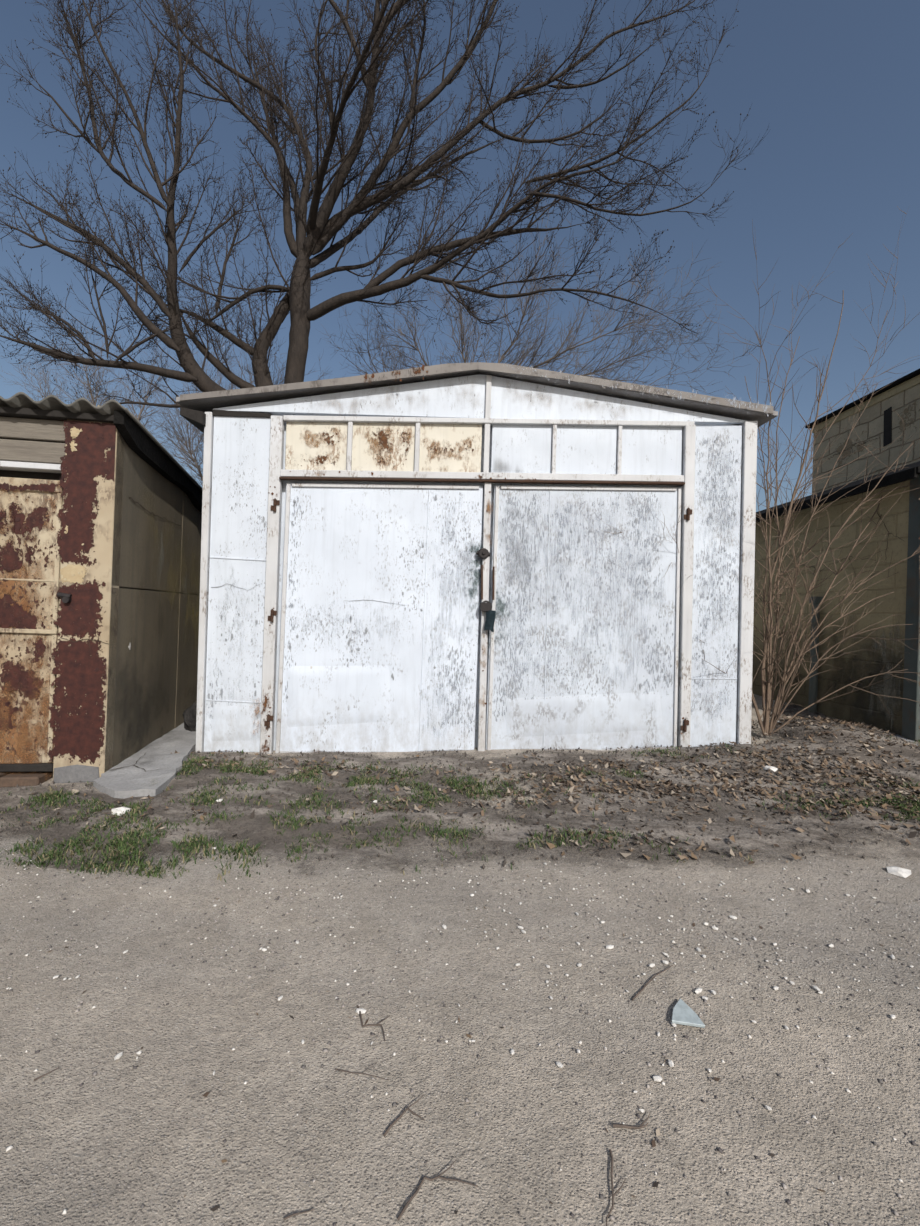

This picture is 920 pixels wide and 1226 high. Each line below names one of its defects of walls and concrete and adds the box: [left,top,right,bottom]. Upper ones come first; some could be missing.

rust [290,428,340,475]
rust [365,430,474,475]
rust [0,566,38,628]
rust [0,688,54,764]